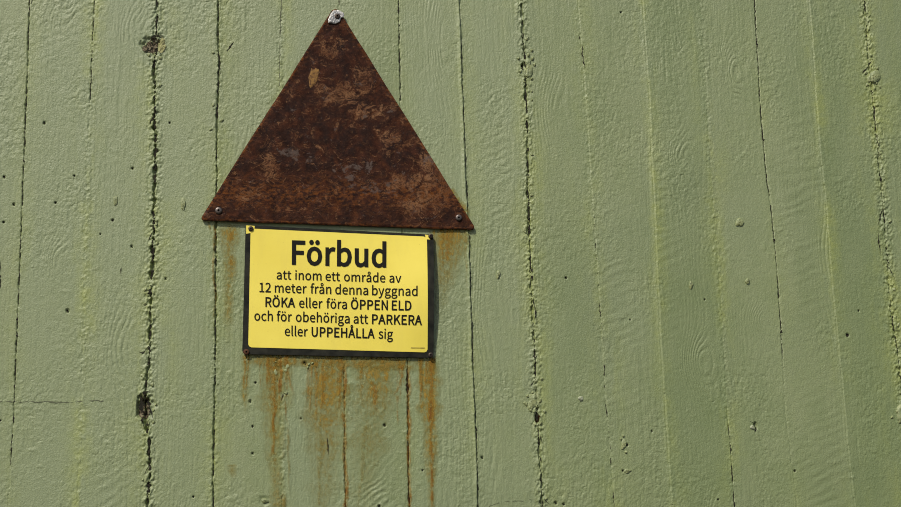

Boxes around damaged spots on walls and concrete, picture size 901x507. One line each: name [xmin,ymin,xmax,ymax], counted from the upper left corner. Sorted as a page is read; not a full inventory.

corrosion [433,229,467,282]
corrosion [243,355,439,500]